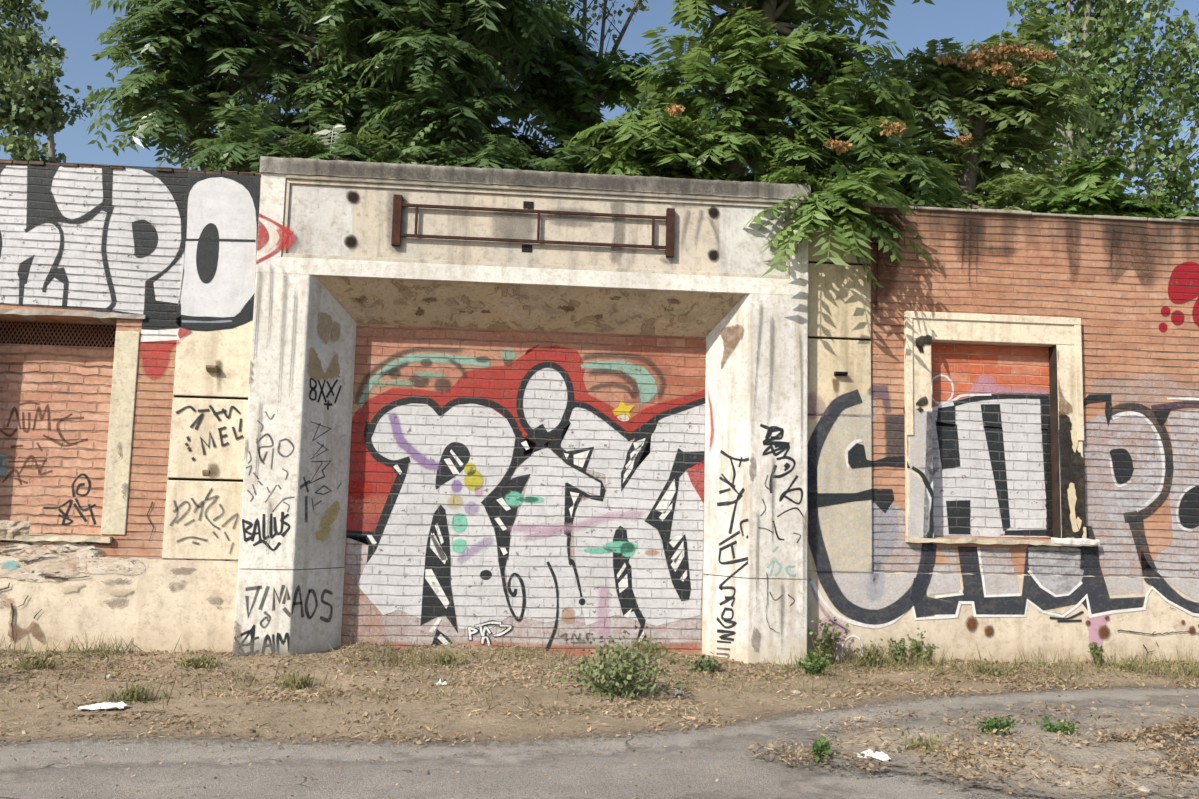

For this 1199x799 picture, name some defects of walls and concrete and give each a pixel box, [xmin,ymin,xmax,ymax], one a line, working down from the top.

flaking render [0,540,145,607]
flaking render [0,594,43,643]